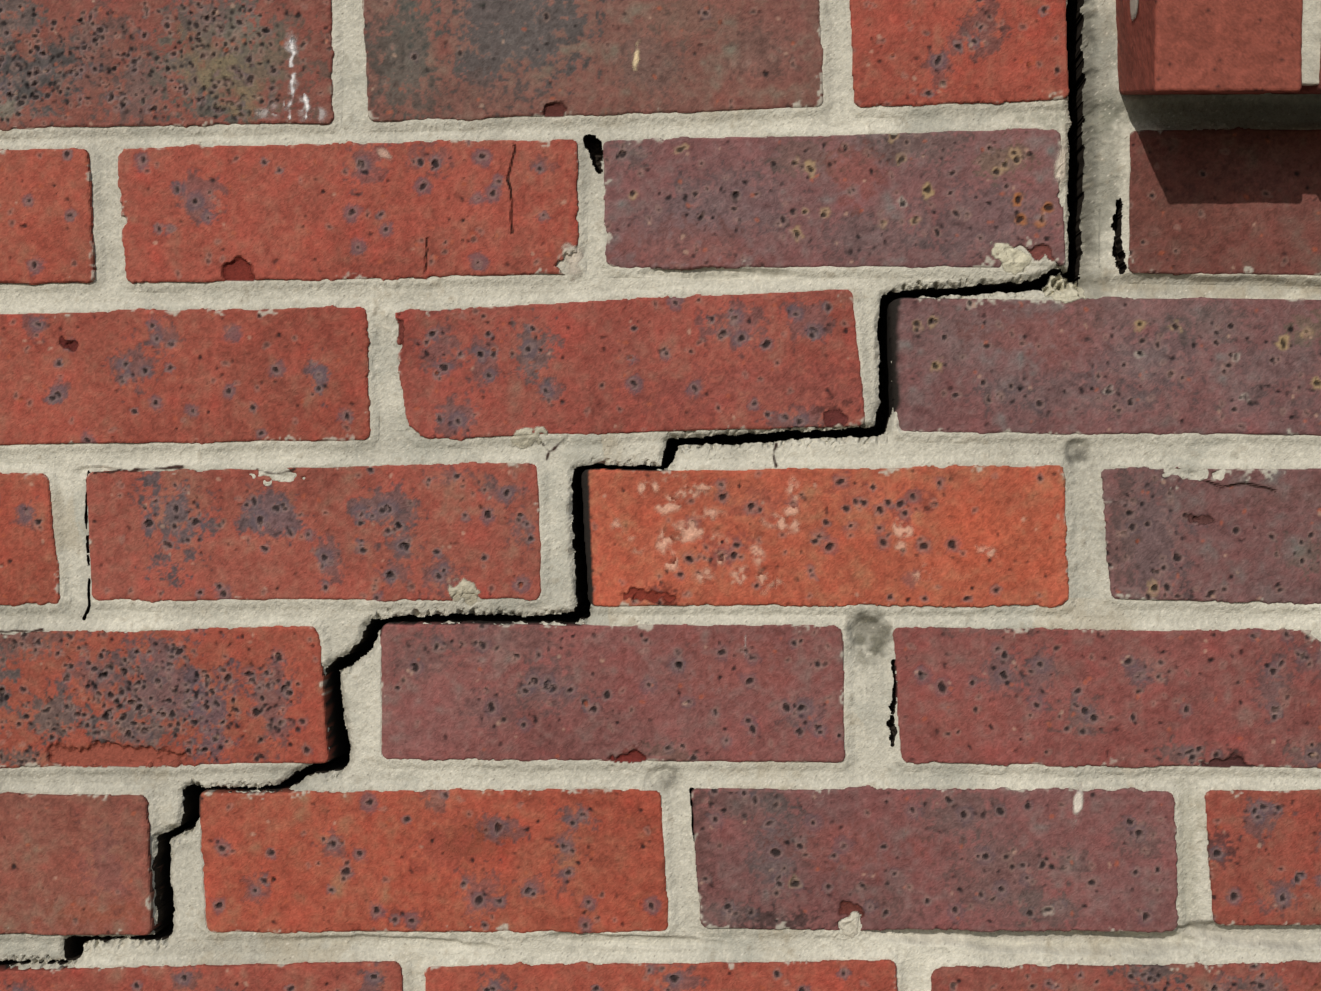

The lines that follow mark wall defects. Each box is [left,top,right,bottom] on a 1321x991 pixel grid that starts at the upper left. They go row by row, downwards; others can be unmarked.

crack [325,0,1086,675]
crack [93,465,183,474]
crack [0,626,43,634]
crack [2,722,351,966]